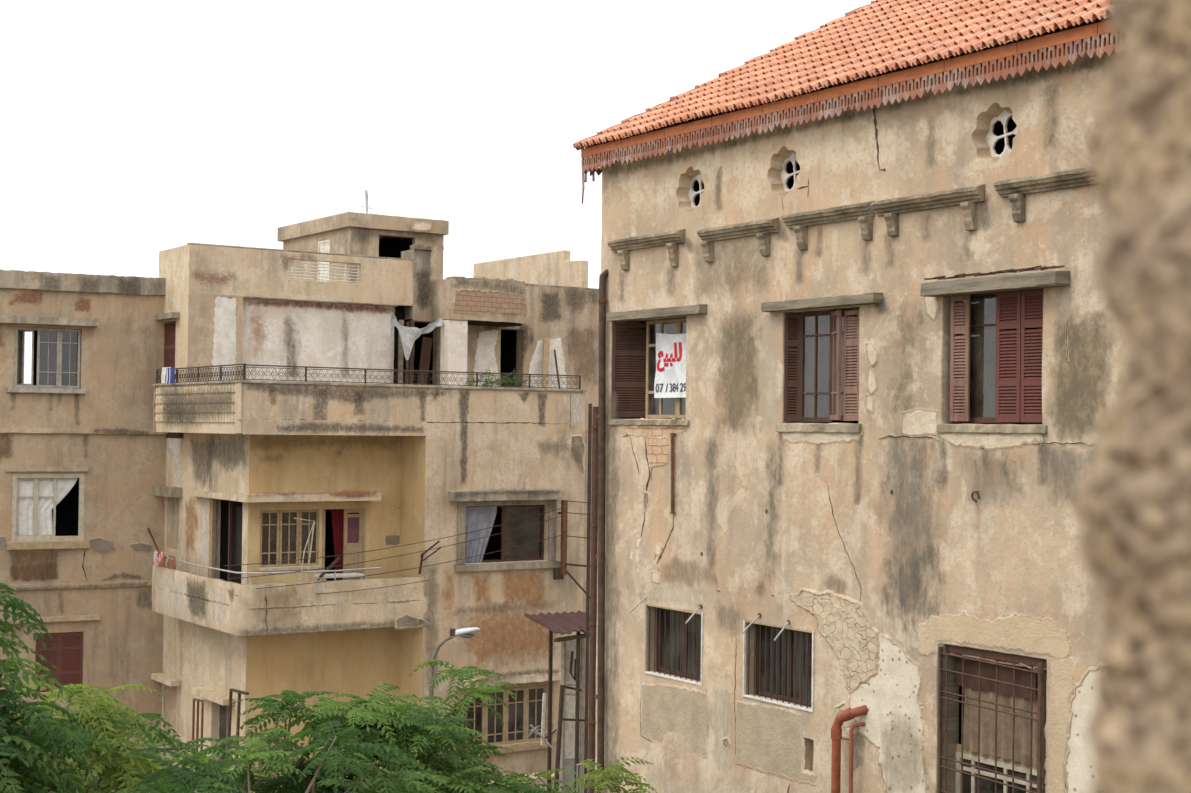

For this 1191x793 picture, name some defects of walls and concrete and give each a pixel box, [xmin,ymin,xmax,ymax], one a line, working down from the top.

water stain [252,320,443,432]
water stain [721,318,774,426]
water stain [166,439,245,485]
crack [623,434,675,572]
flaking render [622,418,687,468]
crack [827,481,863,602]
water stain [891,443,933,606]
flaking render [789,587,929,793]
flaking render [1063,662,1101,793]